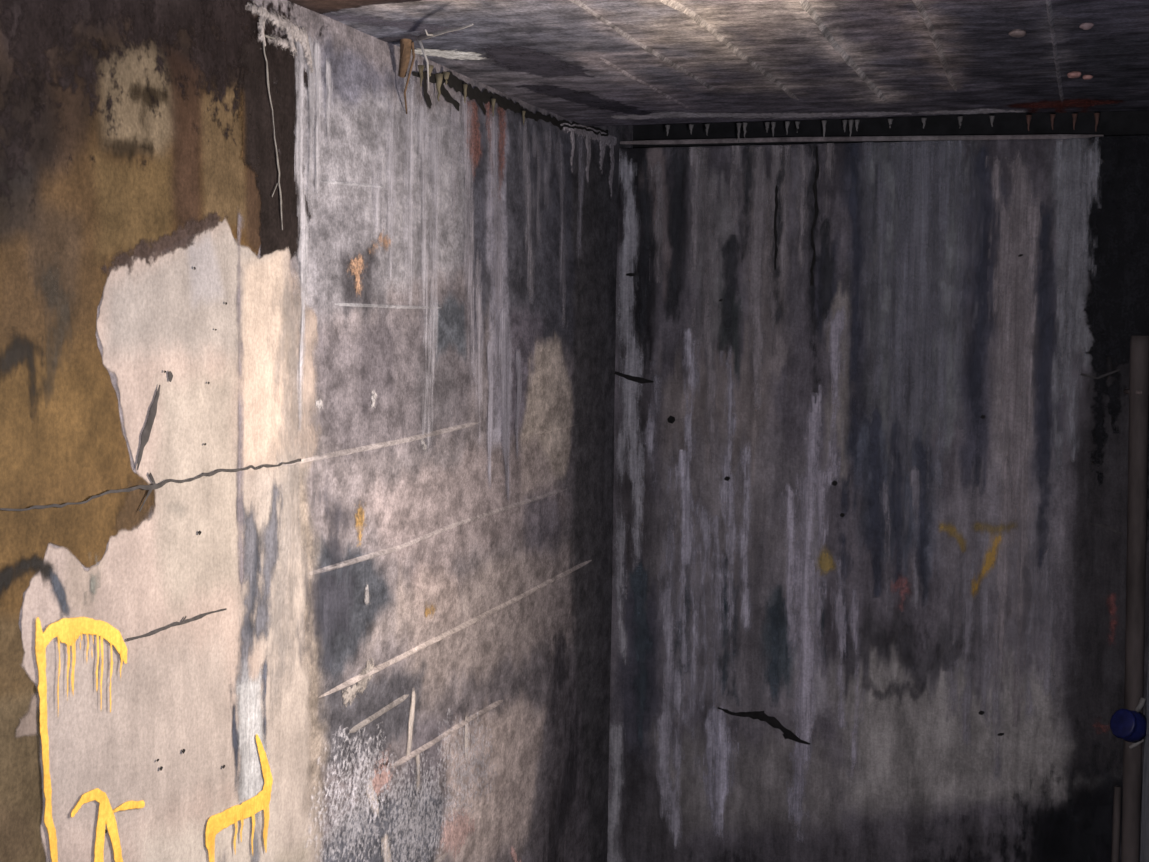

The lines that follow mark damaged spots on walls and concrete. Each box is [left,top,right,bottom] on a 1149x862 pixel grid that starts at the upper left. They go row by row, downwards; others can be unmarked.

damp [409,216,438,285]
crack [0,371,301,511]
damp [0,0,331,862]
peeling [16,219,323,862]
damp [487,310,521,499]
damp [560,123,1100,862]
damp [1085,331,1127,484]
crack [127,608,227,642]
damp [366,779,378,814]
damp [381,835,391,862]
damp [406,692,420,791]
crack [718,707,811,745]